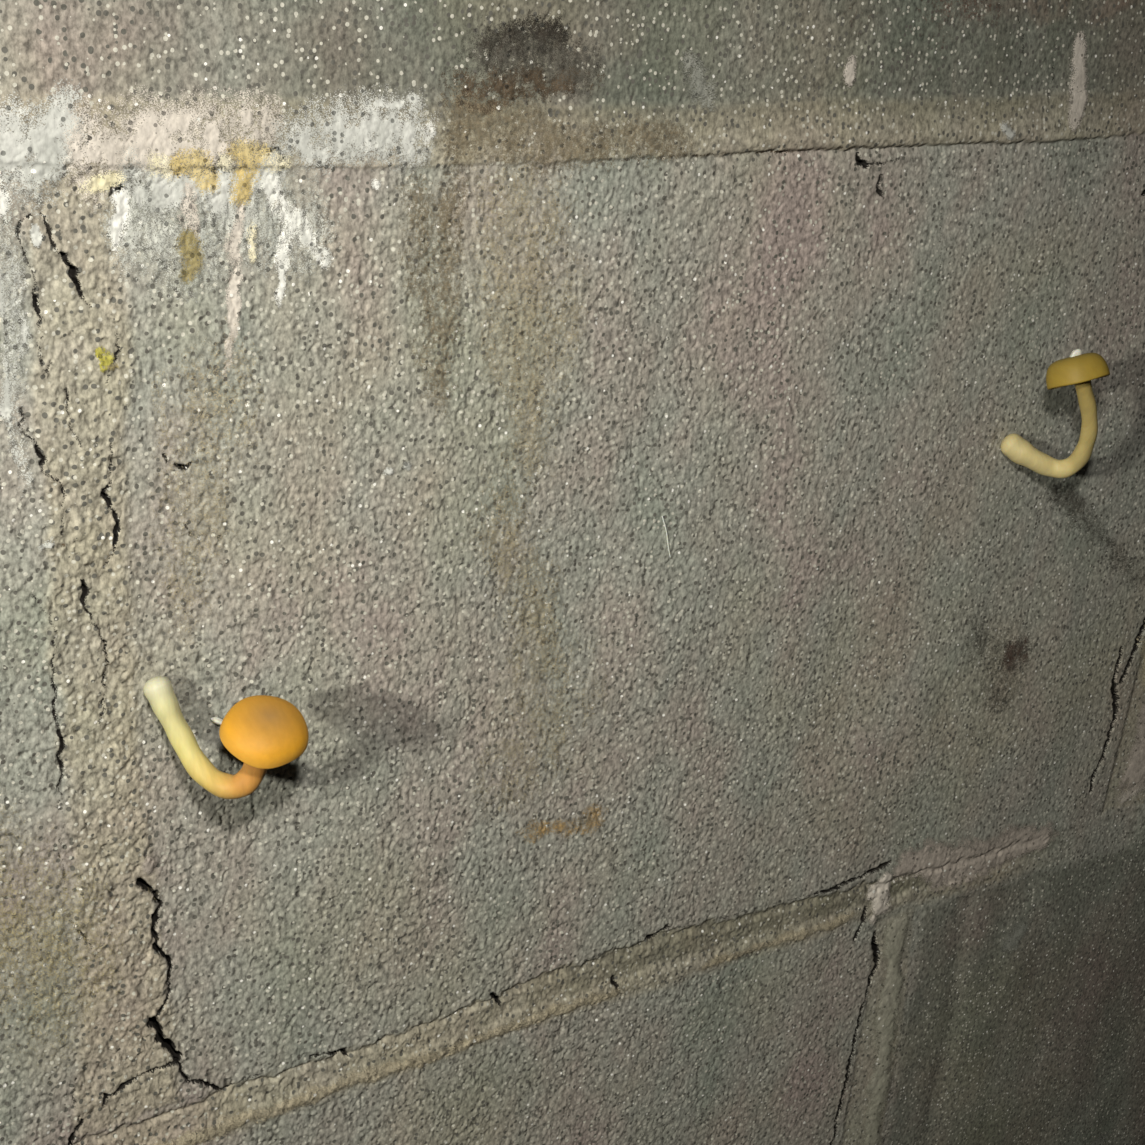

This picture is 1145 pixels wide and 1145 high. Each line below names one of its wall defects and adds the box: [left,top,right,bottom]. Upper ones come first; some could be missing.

crack [17,408,67,535]
crack [15,212,92,447]
crack [80,442,121,724]
crack [106,333,121,383]
water stain [0,5,698,843]
crack [31,595,65,888]
crack [1089,618,1145,792]
crack [836,860,892,886]
crack [68,877,260,1145]
crack [830,906,881,1145]